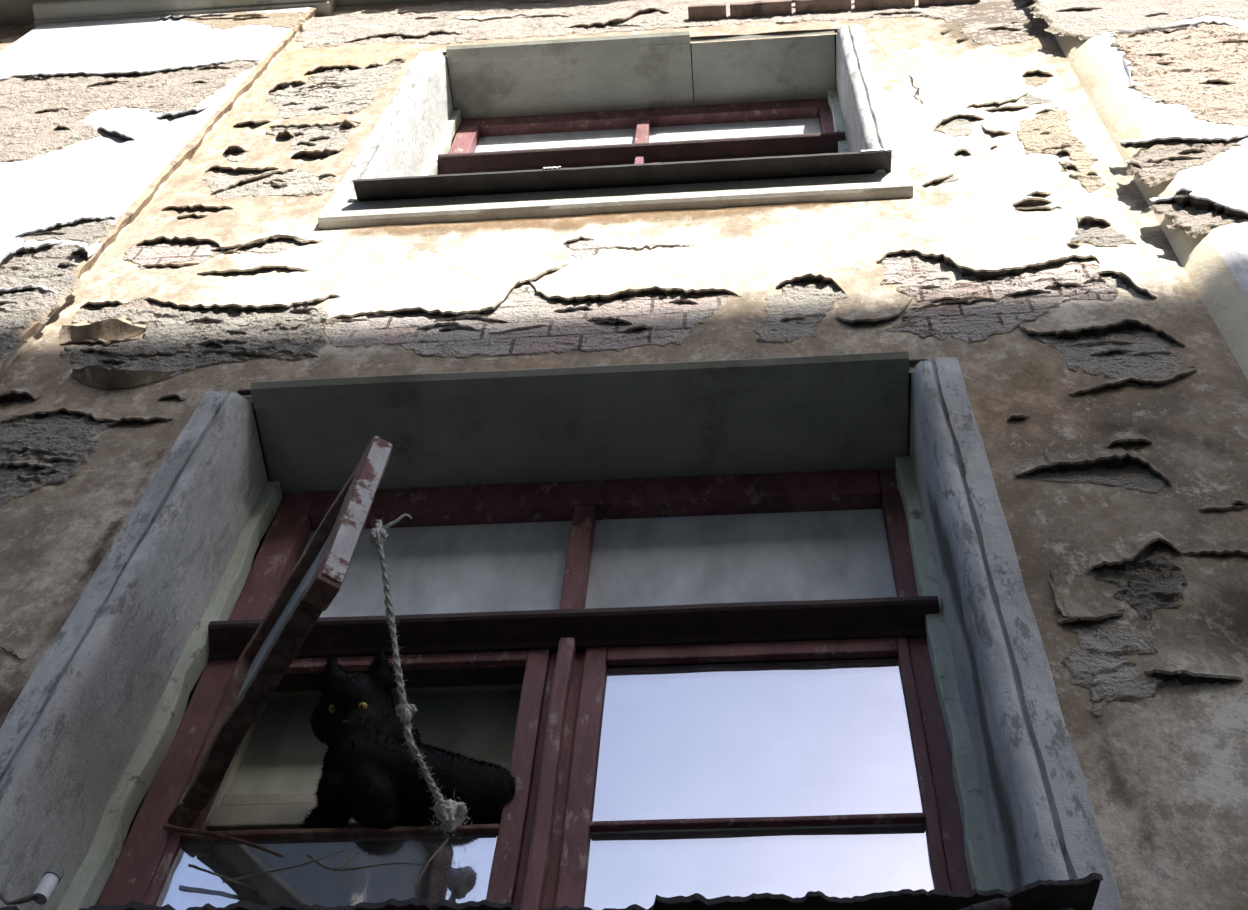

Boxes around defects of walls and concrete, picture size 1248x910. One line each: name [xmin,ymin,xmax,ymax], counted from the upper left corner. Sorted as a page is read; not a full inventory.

spalling [0,59,265,162]
spalling [153,0,1248,238]
spalling [0,215,742,389]
spalling [754,213,1197,396]
spalling [0,383,188,507]
flaking render [1101,431,1152,449]
spalling [1048,528,1248,719]